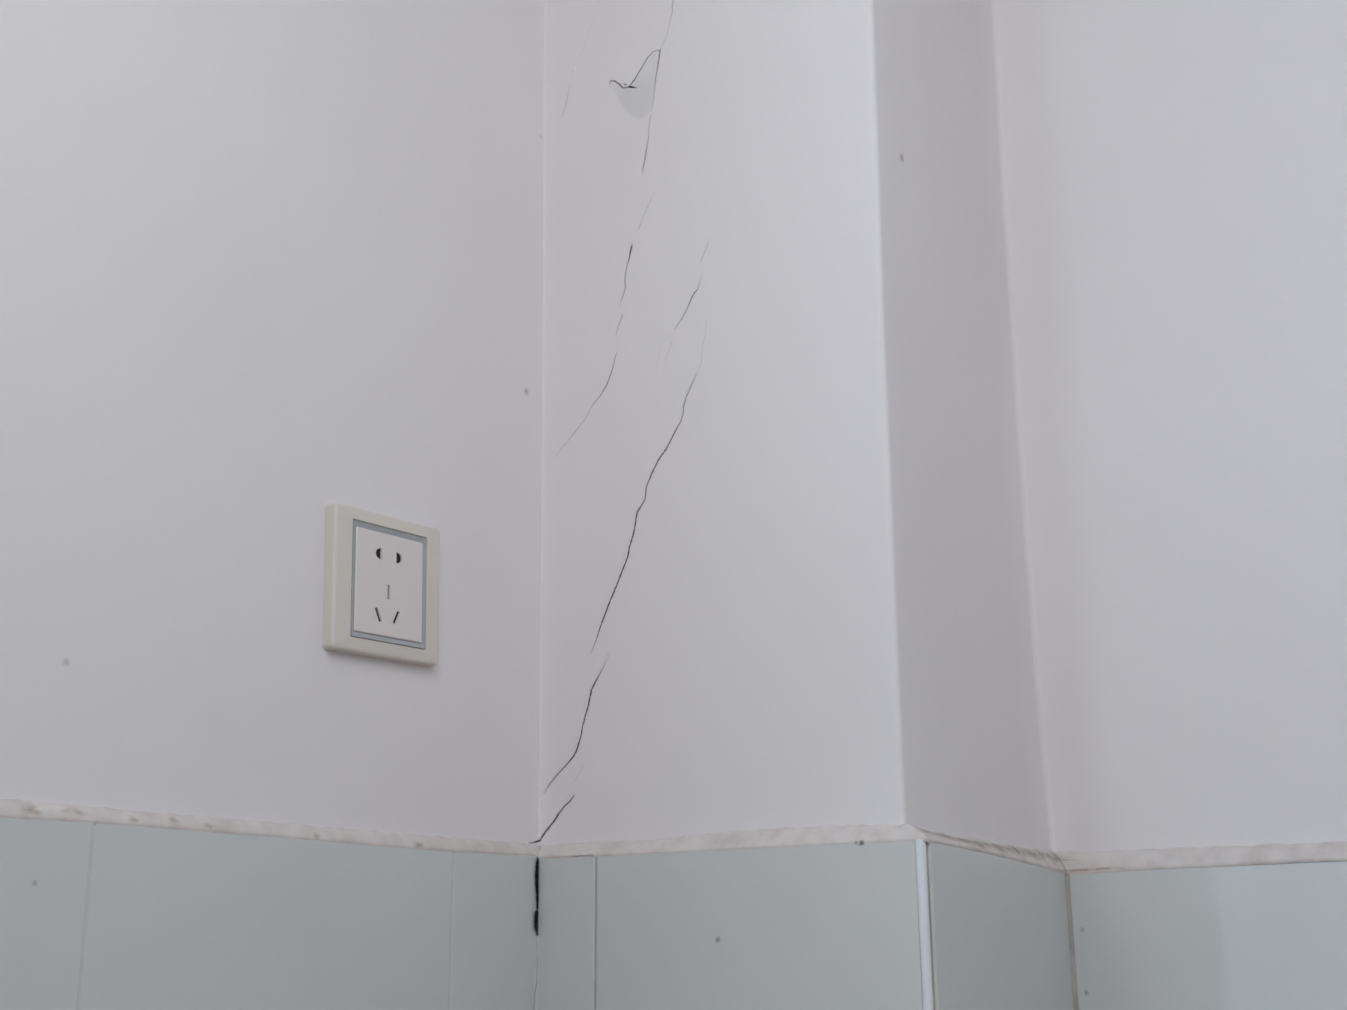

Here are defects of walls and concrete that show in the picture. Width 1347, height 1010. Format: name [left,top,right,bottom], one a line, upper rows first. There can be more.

peeling [608,47,660,120]
crack [532,372,697,843]